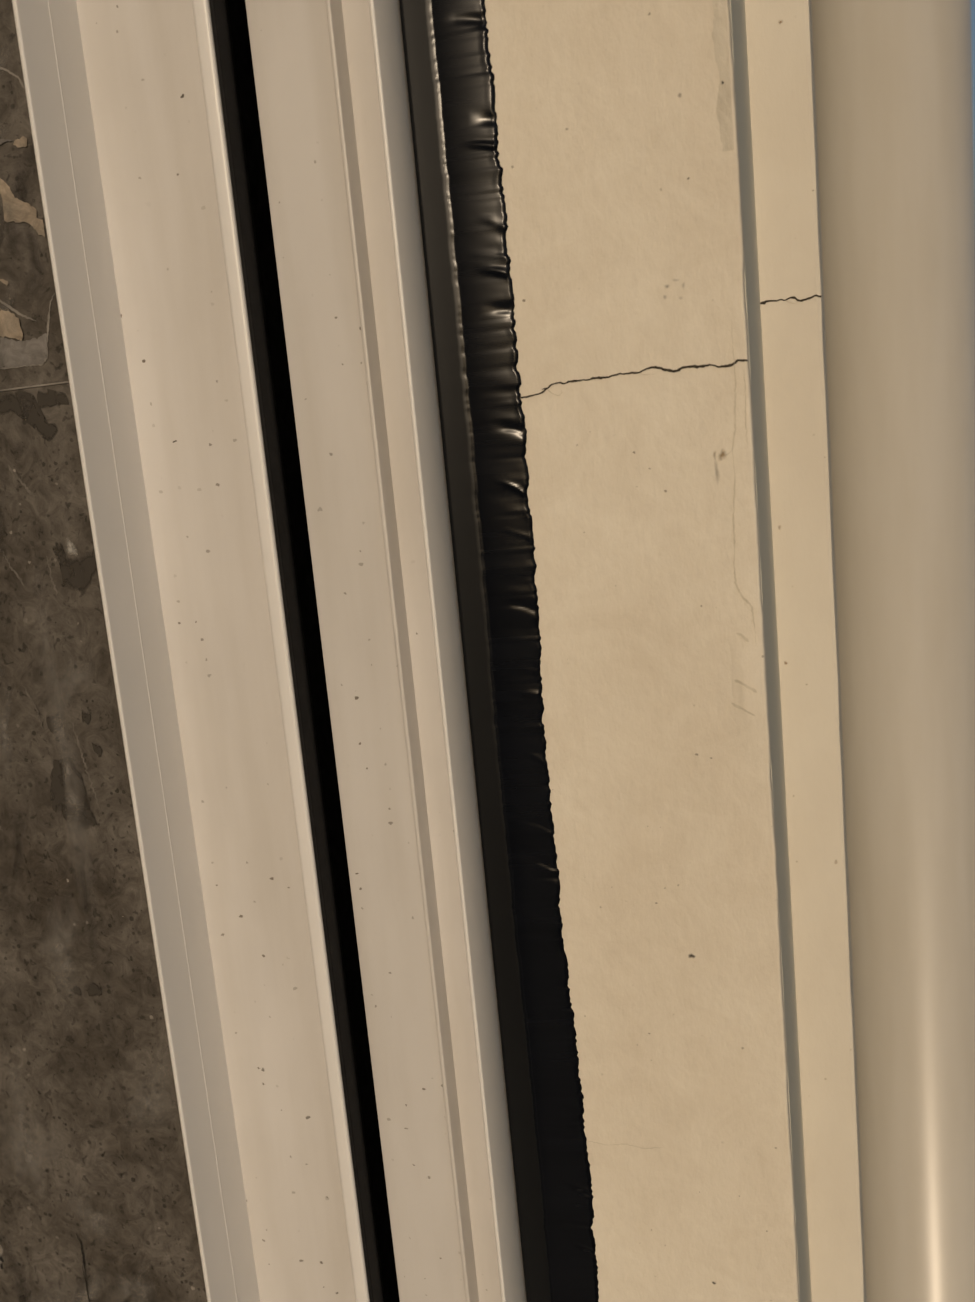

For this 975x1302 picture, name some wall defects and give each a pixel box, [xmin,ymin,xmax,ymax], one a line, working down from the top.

crack [760,294,822,304]
crack [520,321,756,641]